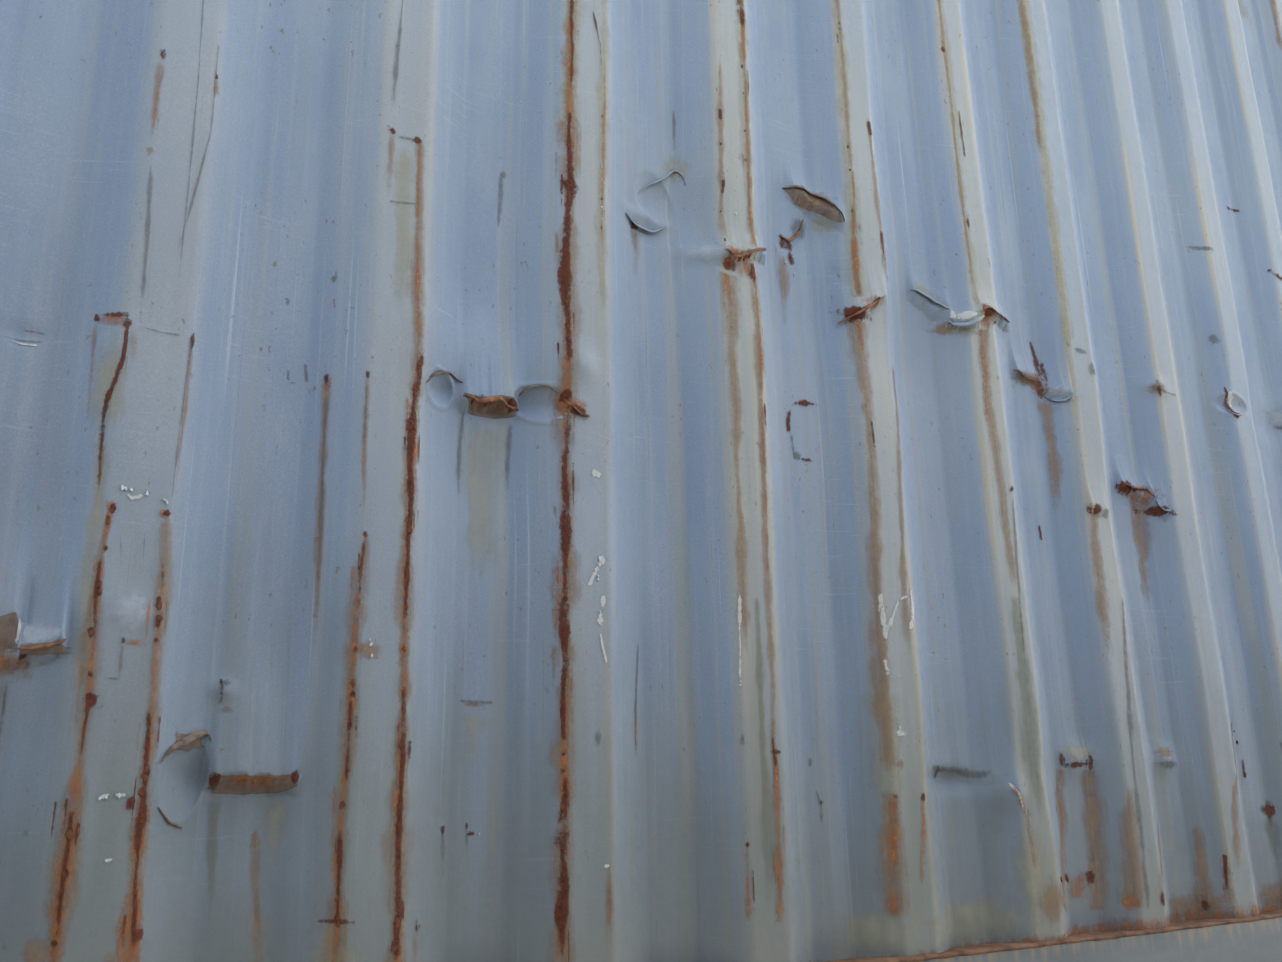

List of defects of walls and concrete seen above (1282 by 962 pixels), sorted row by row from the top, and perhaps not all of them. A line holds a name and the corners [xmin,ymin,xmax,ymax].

corrosion [390,128,422,215]
corrosion [737,0,752,187]
corrosion [847,143,878,308]
corrosion [51,502,116,962]
corrosion [94,312,132,480]
corrosion [109,564,169,962]
corrosion [319,679,357,962]
corrosion [391,355,424,962]
corrosion [554,0,585,962]
corrosion [772,731,785,911]
corrosion [852,321,892,762]
corrosion [1056,771,1278,939]